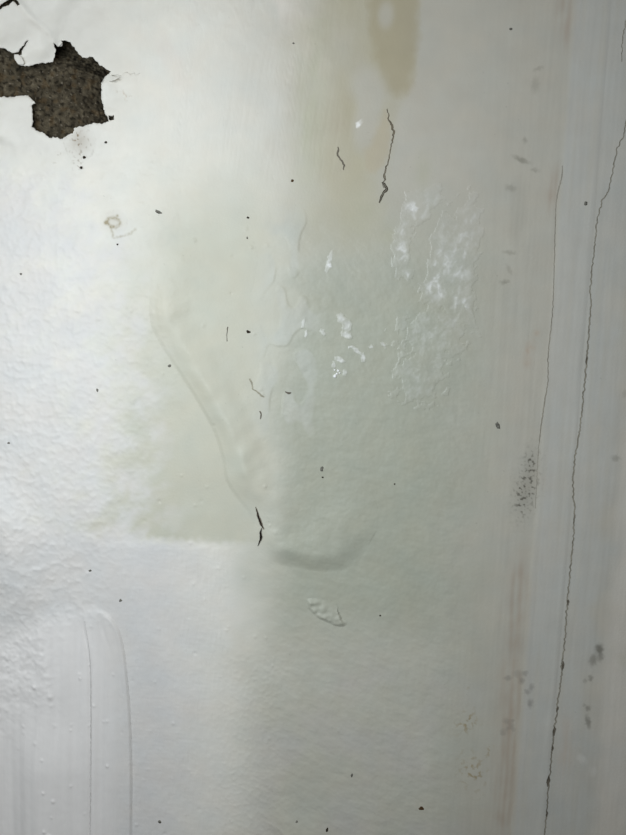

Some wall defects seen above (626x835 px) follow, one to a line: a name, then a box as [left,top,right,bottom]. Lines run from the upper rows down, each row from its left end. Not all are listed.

peeling [0,0,142,174]
leakage [273,0,485,411]
crack [379,110,395,203]
leakage [506,436,547,533]
crack [544,121,626,835]